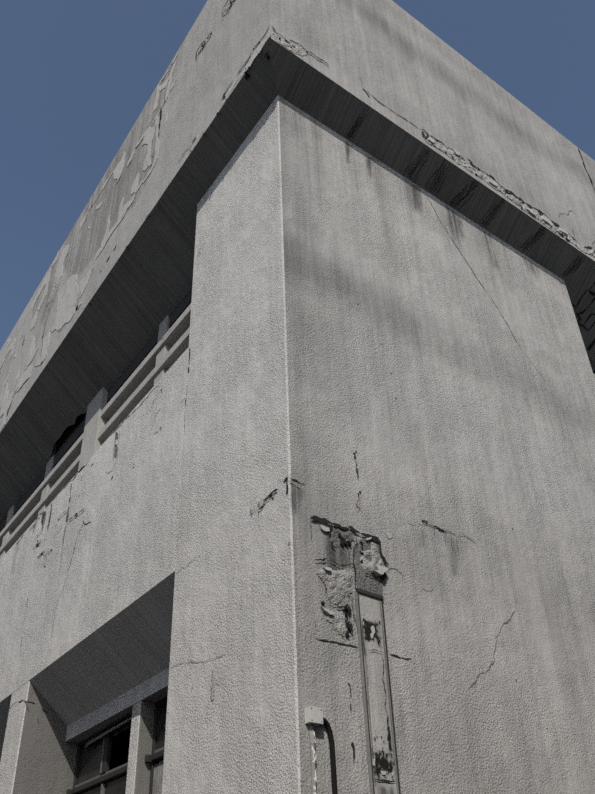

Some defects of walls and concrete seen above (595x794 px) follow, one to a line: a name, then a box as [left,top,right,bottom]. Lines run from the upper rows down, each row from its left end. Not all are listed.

crack [216,29,271,115]
peeling [0,52,178,432]
spalling [422,129,595,257]
crack [572,283,595,331]
crack [17,466,91,635]
flaking render [310,515,389,637]
crack [471,611,515,687]